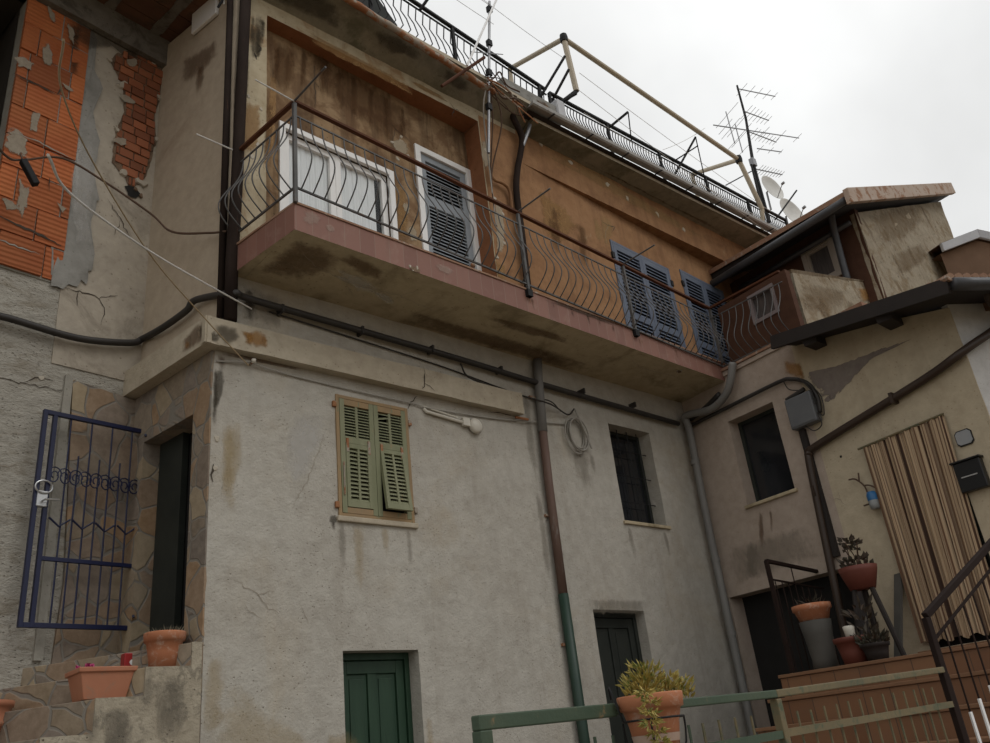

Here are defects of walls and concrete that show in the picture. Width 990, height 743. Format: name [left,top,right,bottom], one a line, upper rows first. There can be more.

spalling [119,169,148,198]
crack [2,377,59,391]